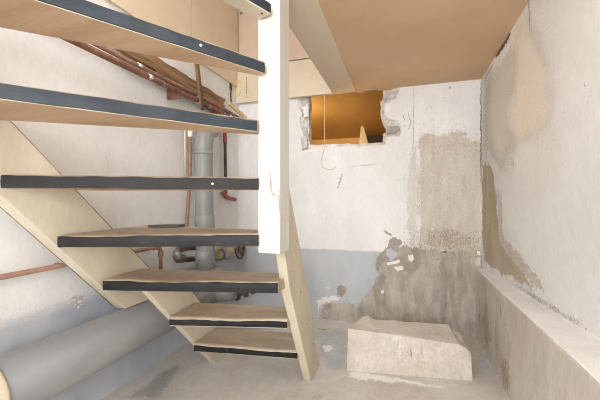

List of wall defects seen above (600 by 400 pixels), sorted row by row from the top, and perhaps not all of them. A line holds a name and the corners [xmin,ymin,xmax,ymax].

spalling [297,88,406,152]
water stain [403,32,587,330]
peeling [316,230,481,337]